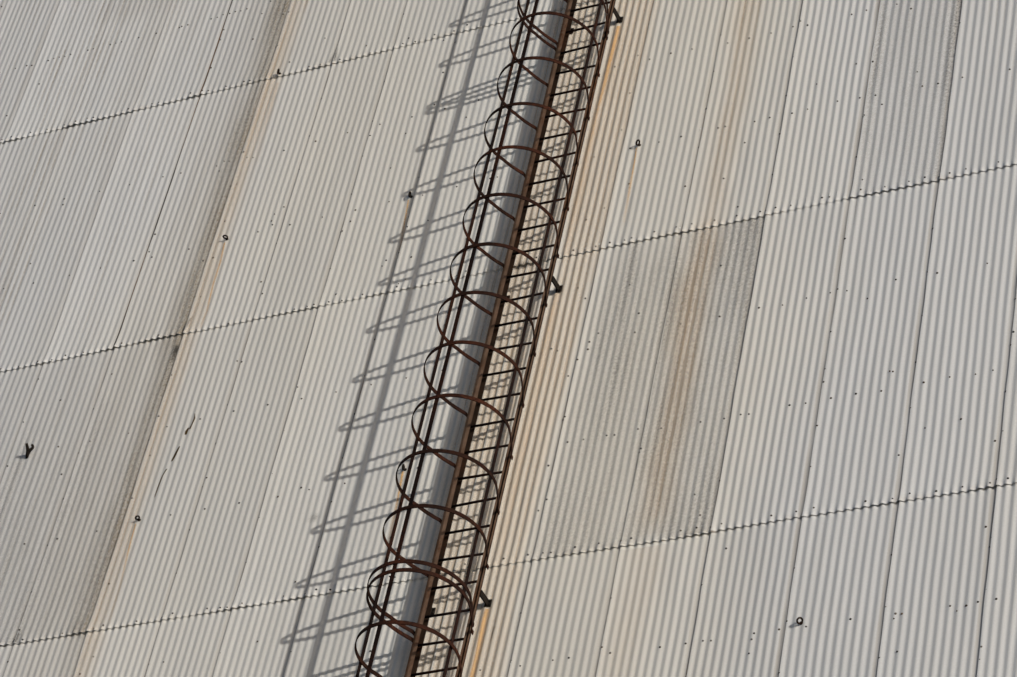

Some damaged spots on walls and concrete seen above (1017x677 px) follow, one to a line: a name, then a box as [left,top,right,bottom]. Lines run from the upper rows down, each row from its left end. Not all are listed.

rust [469,215,541,519]
rust [522,273,581,430]
rust [470,609,490,677]